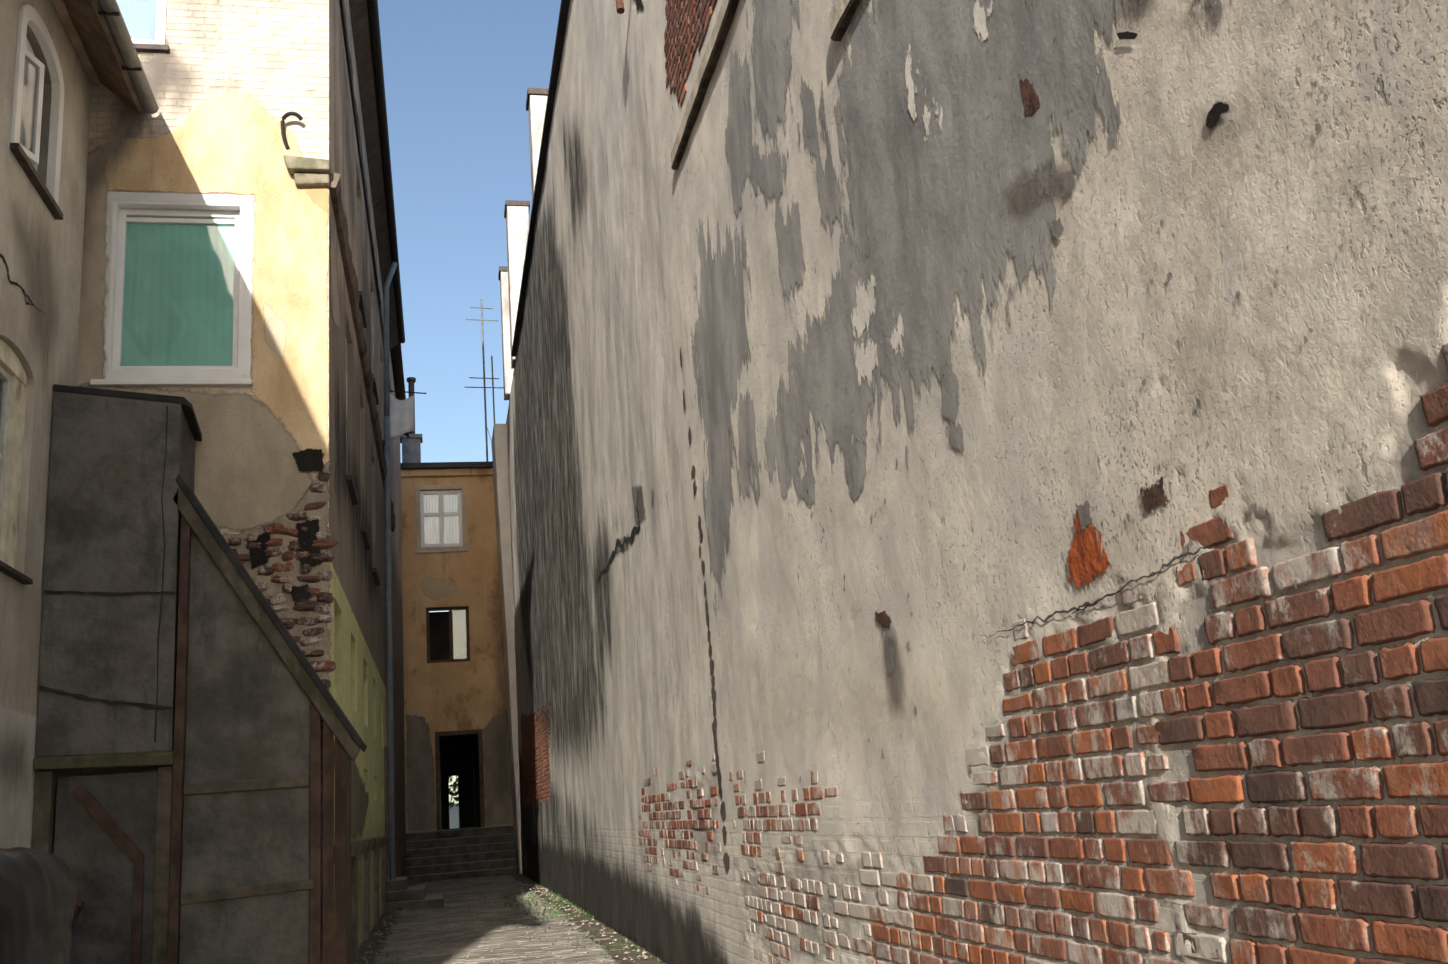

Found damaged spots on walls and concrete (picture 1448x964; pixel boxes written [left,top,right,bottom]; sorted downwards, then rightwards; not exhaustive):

flaking render [615,0,644,14]
crack [0,254,49,374]
flaking render [76,91,340,690]
flaking render [638,0,1448,964]
crack [978,536,1233,637]